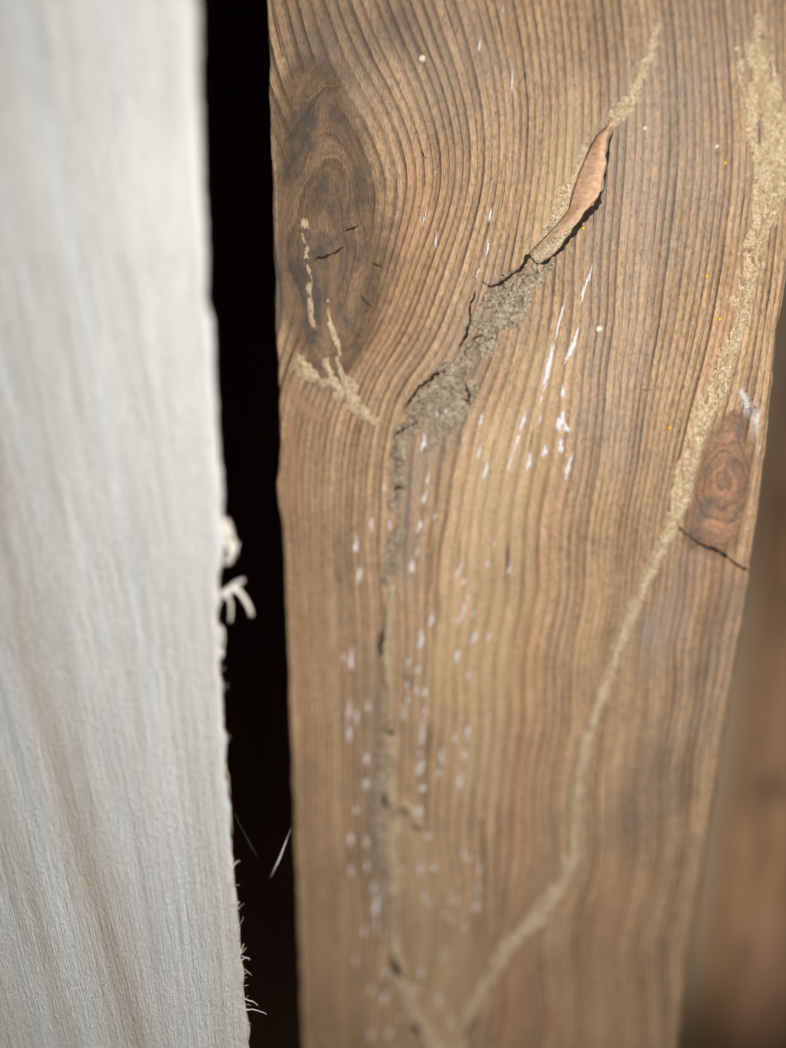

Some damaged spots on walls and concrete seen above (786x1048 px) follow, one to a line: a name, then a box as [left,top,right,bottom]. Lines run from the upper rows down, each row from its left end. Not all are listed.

crack [458,254,532,349]
crack [394,371,470,436]
crack [679,526,748,571]